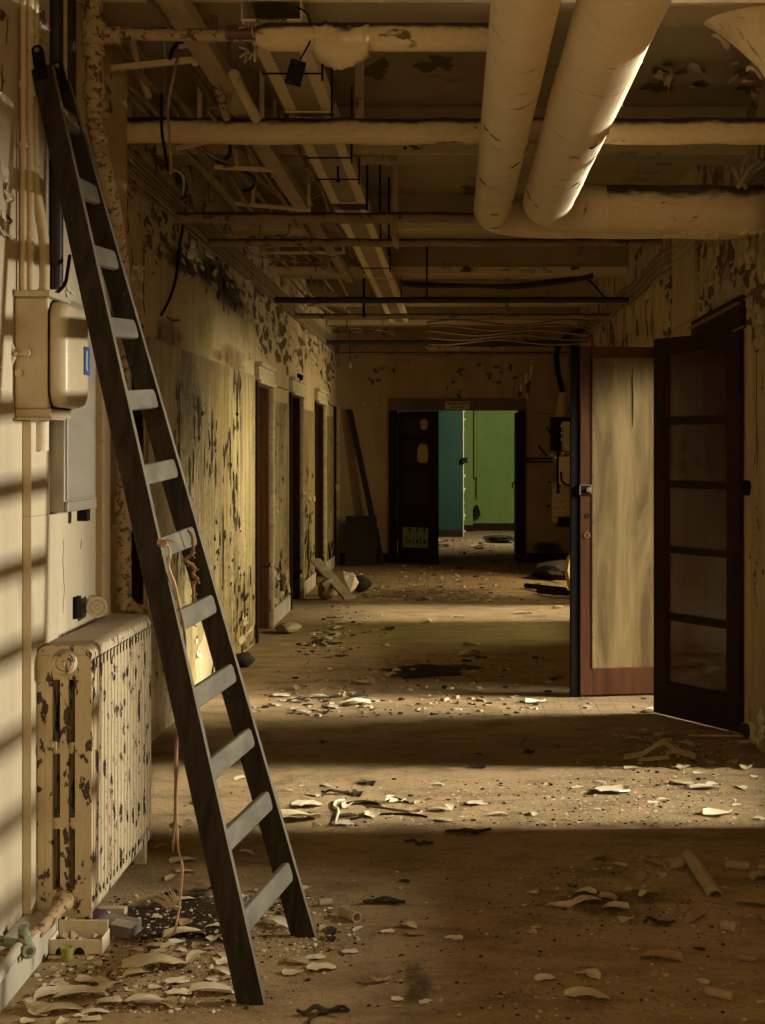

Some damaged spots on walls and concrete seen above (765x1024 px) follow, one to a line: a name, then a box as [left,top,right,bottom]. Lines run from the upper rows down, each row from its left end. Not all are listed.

peeling [638,62,709,93]
peeling [144,186,338,383]
peeling [696,238,765,353]
peeling [238,613,255,652]